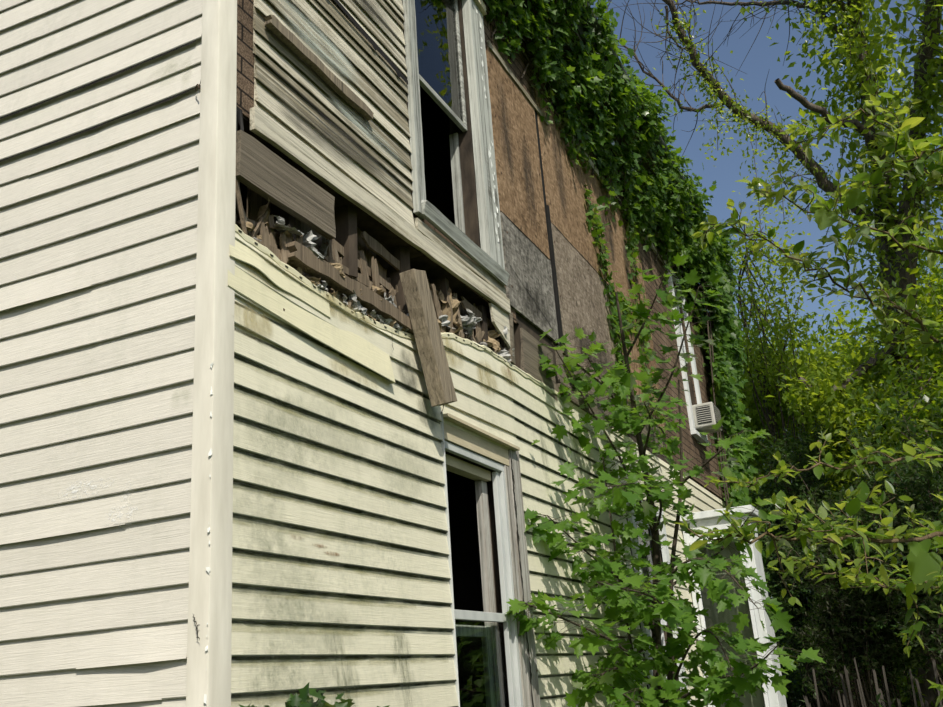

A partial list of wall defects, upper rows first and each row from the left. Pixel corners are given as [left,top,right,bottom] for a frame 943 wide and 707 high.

peeling [488,141,499,242]
spalling [235,177,414,335]
spalling [427,277,514,362]